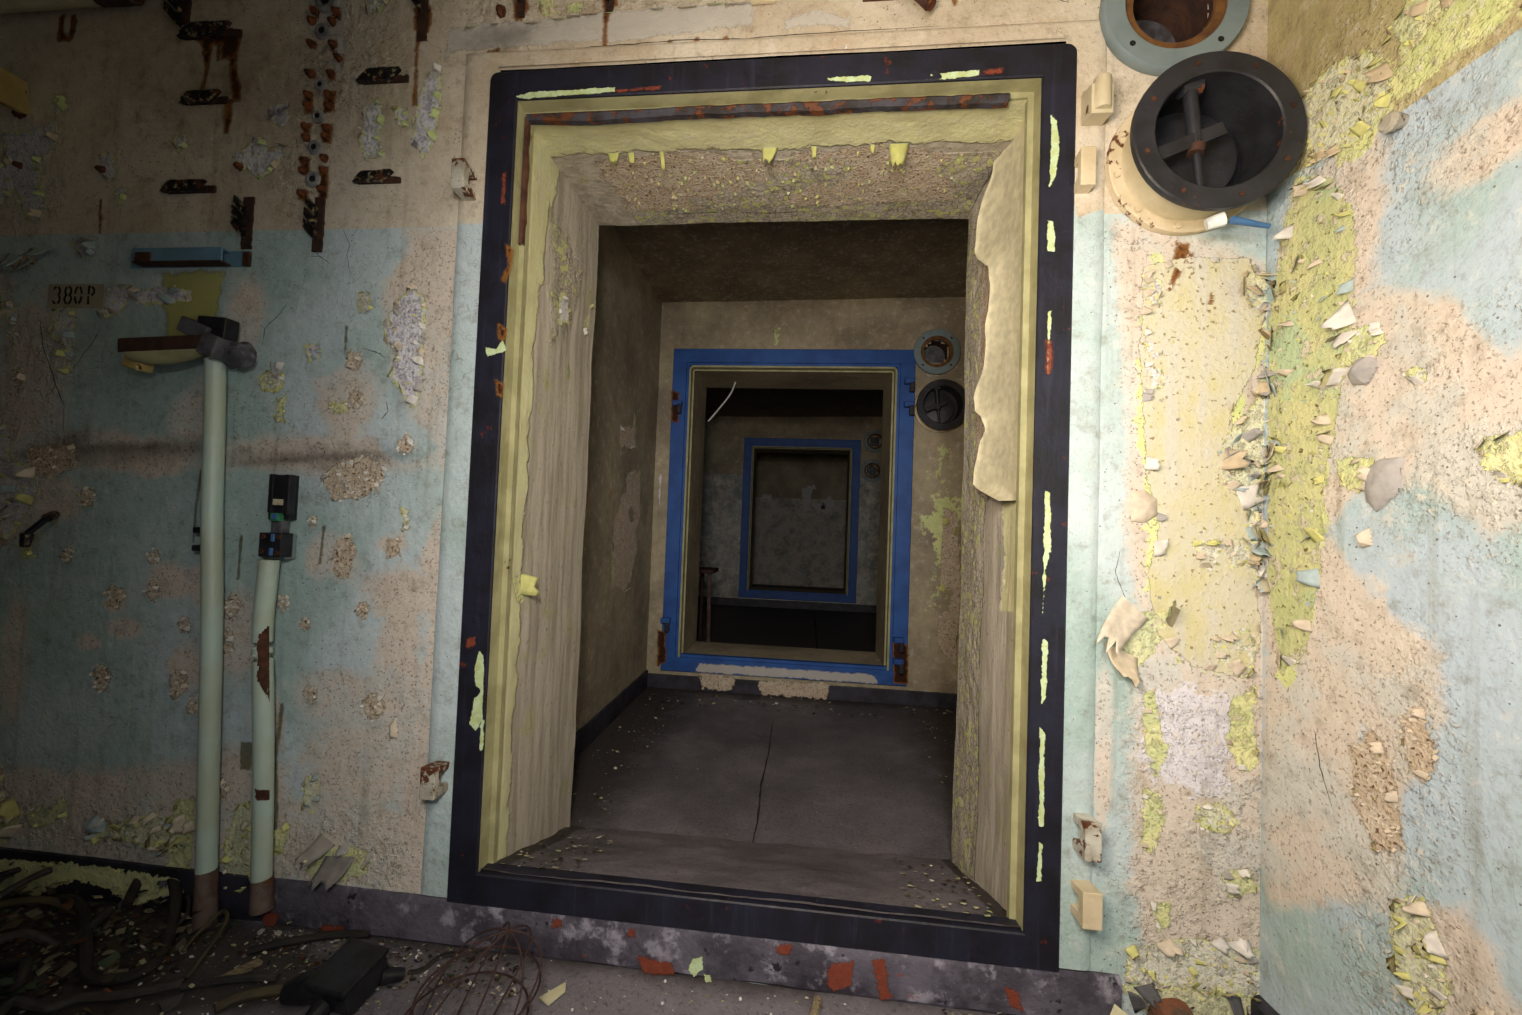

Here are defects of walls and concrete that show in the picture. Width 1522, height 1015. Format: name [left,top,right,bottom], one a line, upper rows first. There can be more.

rust [197,37,242,133]
rust [304,0,347,144]
rust [412,4,432,106]
peeling [0,120,60,223]
rust [298,159,329,202]
peeling [356,279,427,410]
peeling [320,454,388,502]
peeling [1096,0,1453,856]
peeling [1473,429,1522,487]
peeling [0,796,196,909]
peeling [273,774,373,891]
peeling [1385,894,1454,1015]